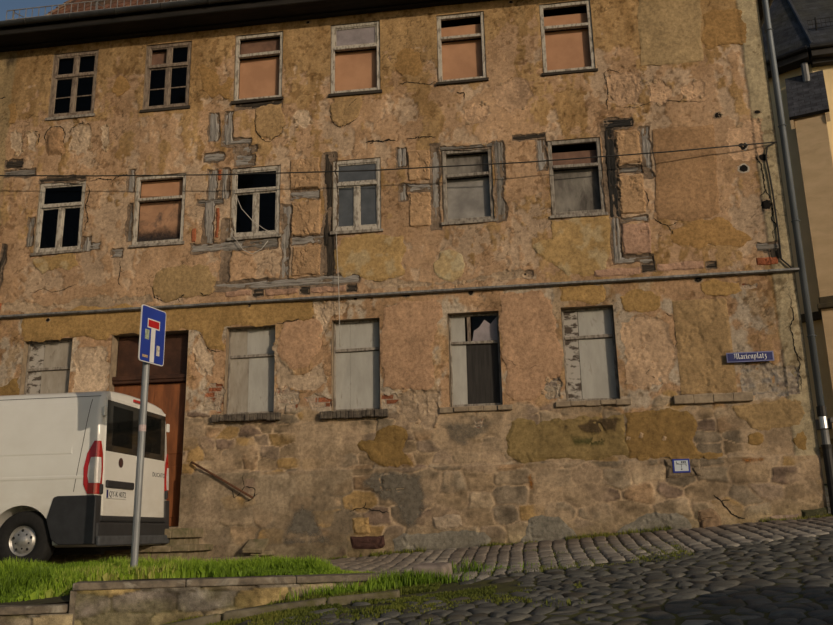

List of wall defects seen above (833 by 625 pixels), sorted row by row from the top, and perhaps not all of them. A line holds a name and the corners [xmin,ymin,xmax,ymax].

flaking render [2,129,86,184]
flaking render [110,169,136,258]
flaking render [161,98,360,413]
flaking render [395,132,549,231]
flaking render [594,116,717,277]
flaking render [726,117,765,161]
crack [755,157,778,240]
flaking render [756,240,780,265]
flaking render [0,293,153,392]
crack [788,294,803,389]
damp [579,418,618,433]
crack [714,495,745,519]